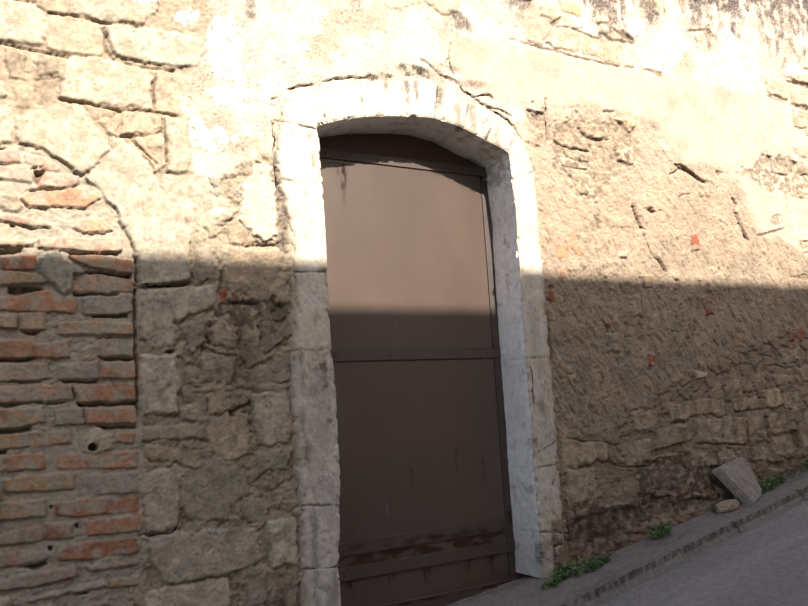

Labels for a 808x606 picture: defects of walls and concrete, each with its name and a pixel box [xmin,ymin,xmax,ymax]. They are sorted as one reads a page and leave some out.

leakage [583,0,665,31]
leakage [690,0,808,63]
crack [422,43,520,136]
spalling [745,156,808,195]